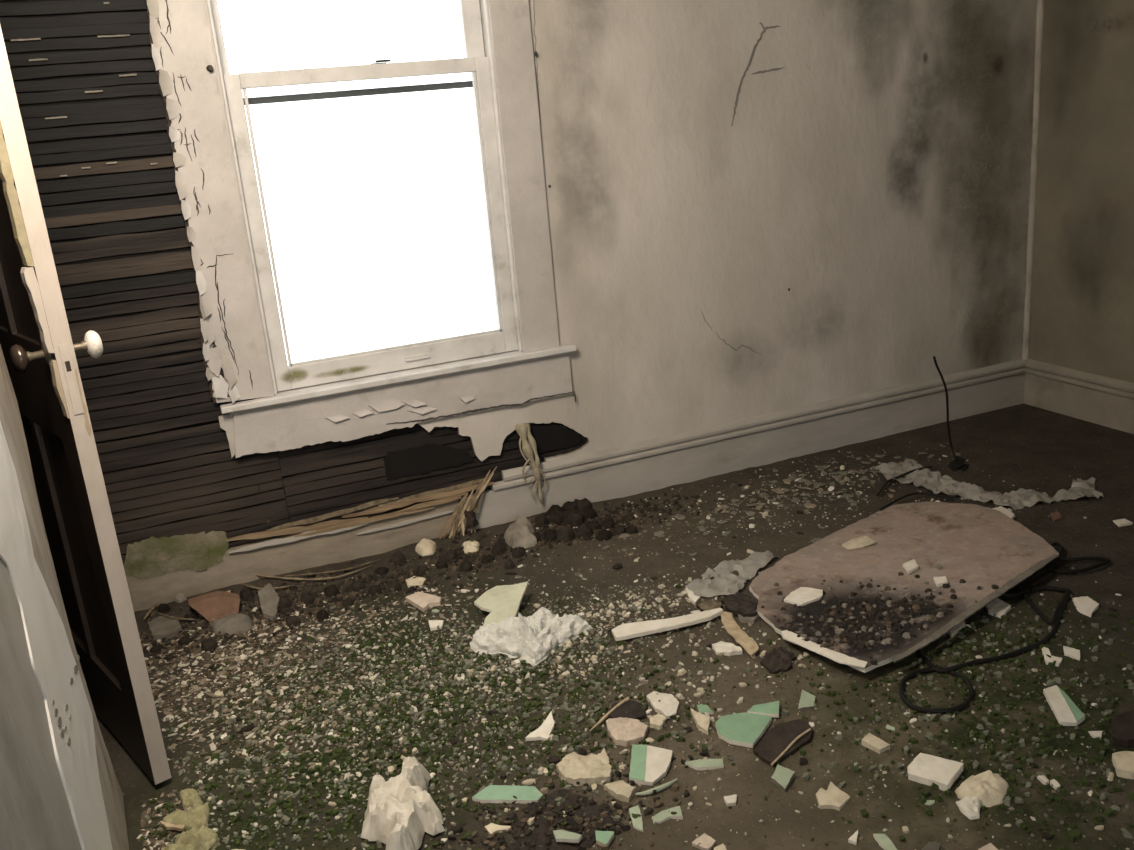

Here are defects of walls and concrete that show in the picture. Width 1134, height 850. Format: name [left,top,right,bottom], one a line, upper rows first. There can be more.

crack [731,23,785,126]
flaking render [0,0,588,565]
crack [389,392,576,424]